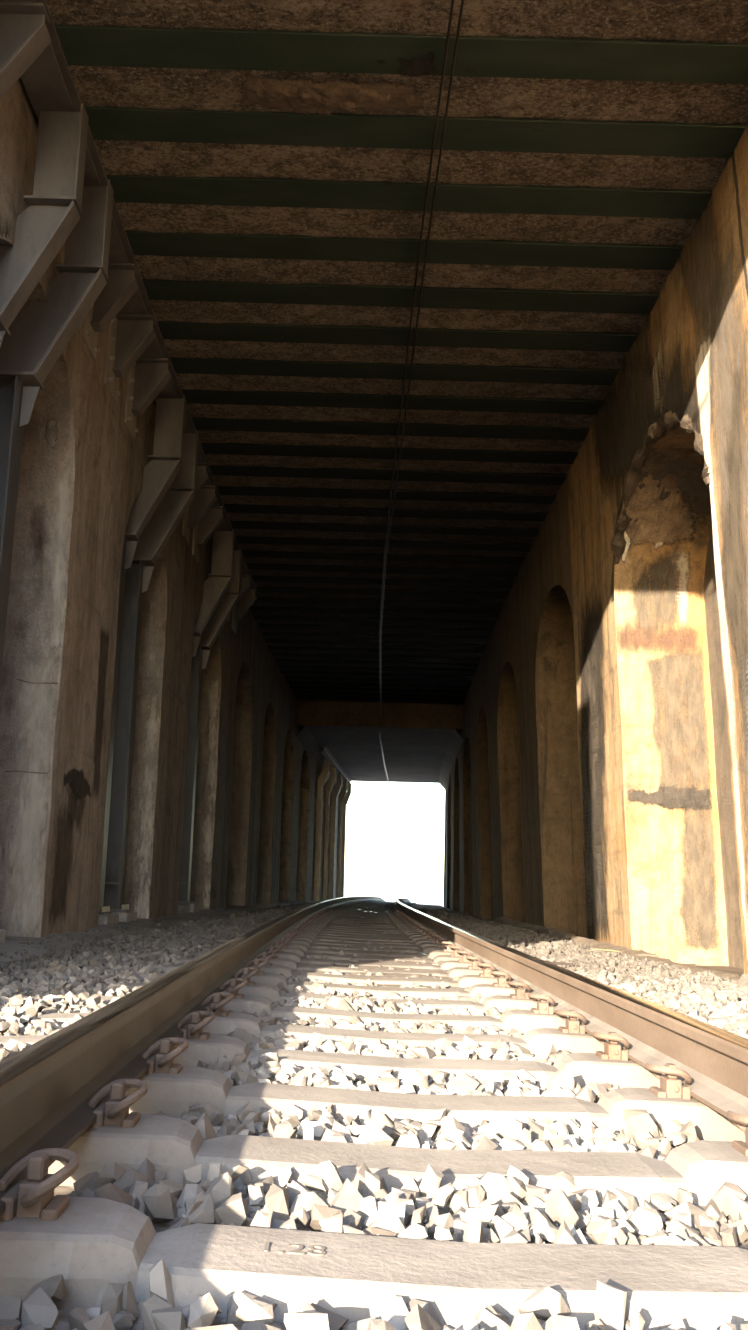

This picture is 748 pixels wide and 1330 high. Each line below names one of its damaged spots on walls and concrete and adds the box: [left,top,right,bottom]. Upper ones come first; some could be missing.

spalling [611,404,710,603]
water stain [591,193,748,863]
water stain [648,654,716,949]